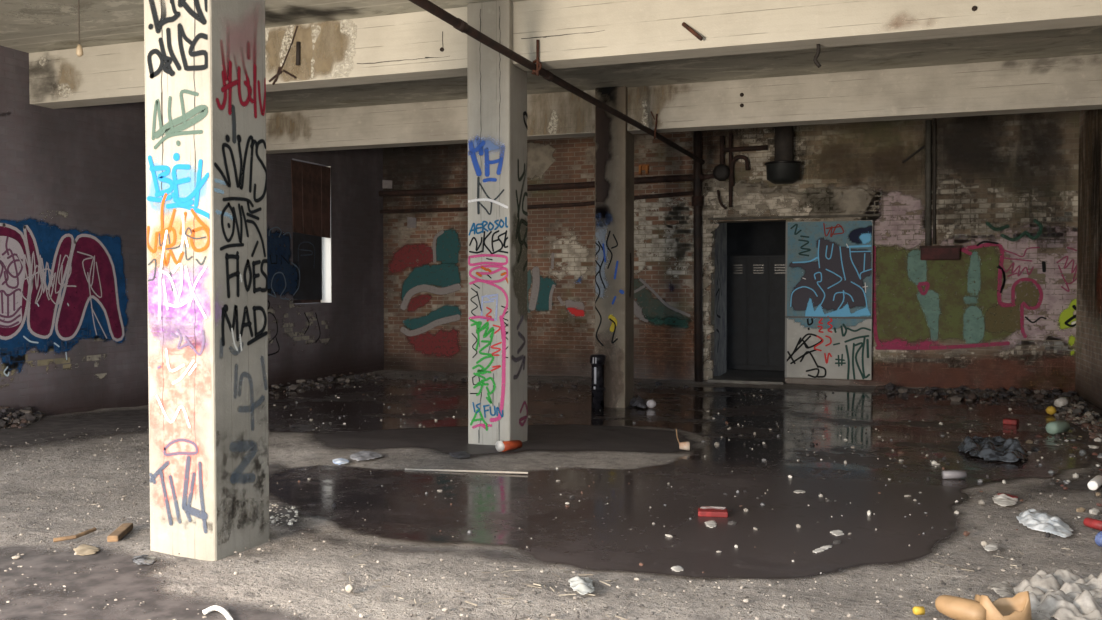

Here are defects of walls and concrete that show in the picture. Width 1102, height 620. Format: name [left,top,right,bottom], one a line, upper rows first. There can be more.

peeling [549,236,589,280]